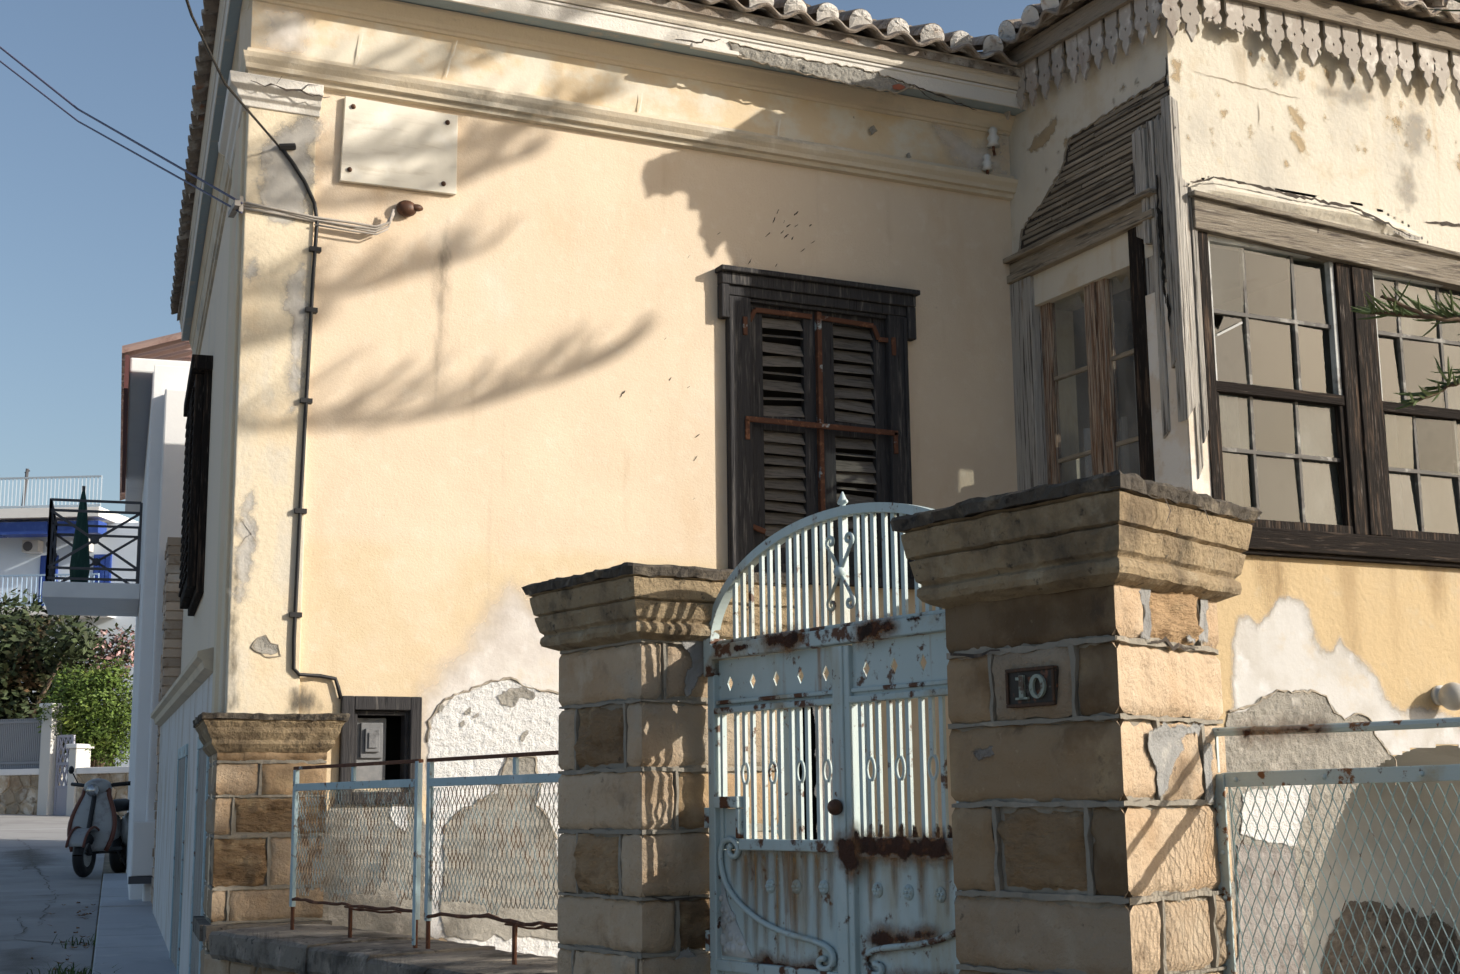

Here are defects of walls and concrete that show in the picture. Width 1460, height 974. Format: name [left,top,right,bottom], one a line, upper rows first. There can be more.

peeling [258,116,323,224]
spalling [1018,59,1181,252]
crack [1427,220,1460,228]
peeling [283,263,308,412]
flaking render [251,635,281,658]
corrosion [734,629,803,654]
corrosion [856,616,920,645]
flaking render [322,588,564,958]
corrosion [1242,724,1324,739]
flaking render [1225,597,1460,974]
corrosion [744,823,952,927]
corrosion [868,926,935,952]